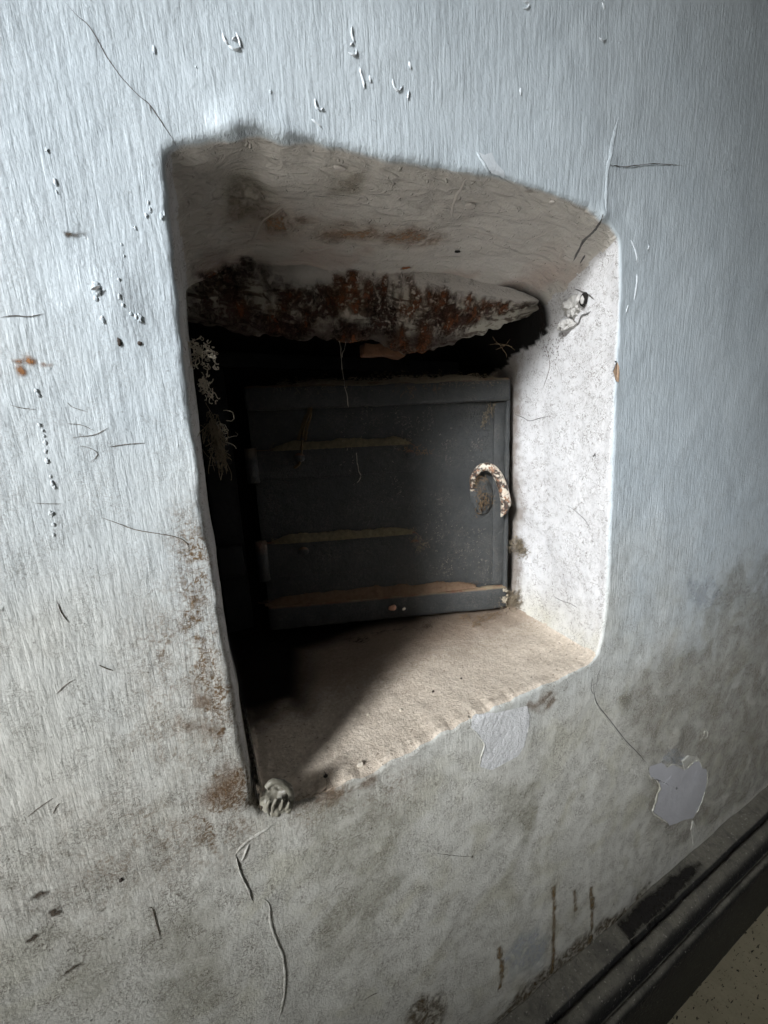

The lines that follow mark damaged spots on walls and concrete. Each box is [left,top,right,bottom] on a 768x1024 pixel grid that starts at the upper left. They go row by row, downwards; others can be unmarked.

crack [605,161,683,169]
crack [573,215,603,263]
rust [262,267,510,354]
rust [15,357,35,375]
peeling [467,706,530,770]
peeling [648,755,708,845]
leakage [498,886,647,1021]